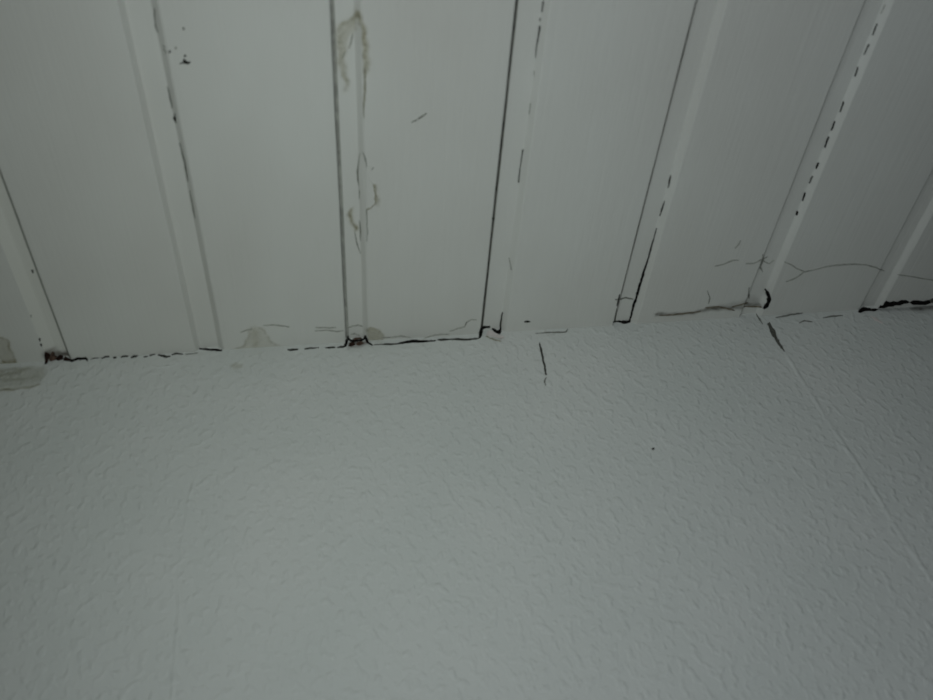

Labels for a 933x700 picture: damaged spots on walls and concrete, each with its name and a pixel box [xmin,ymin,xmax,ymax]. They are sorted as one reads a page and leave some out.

crack [659,240,933,352]
crack [70,348,222,362]
crack [242,312,503,351]
crack [536,329,568,386]